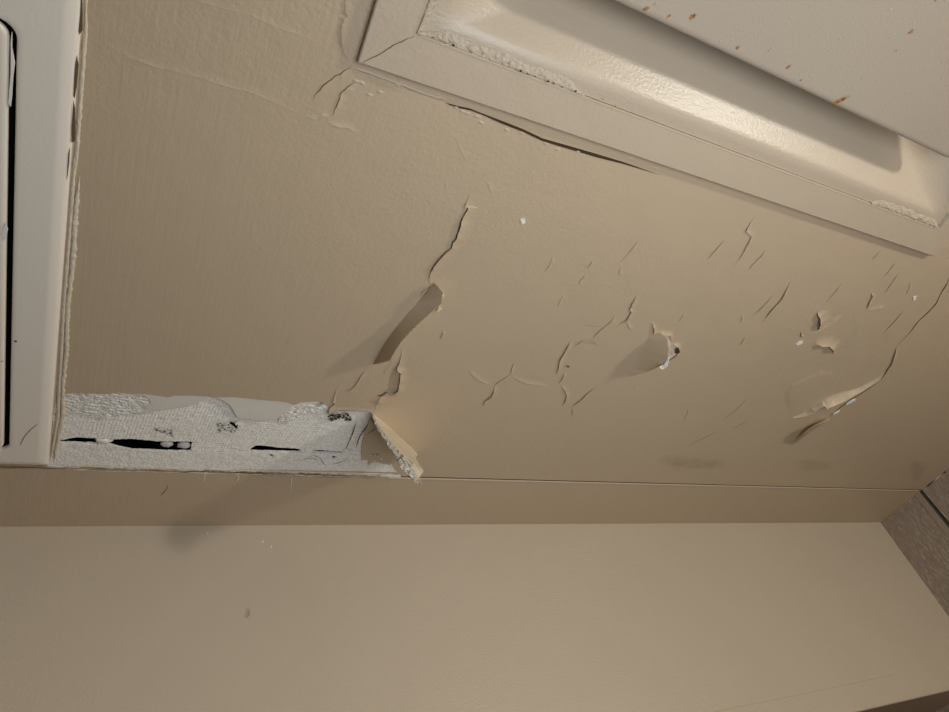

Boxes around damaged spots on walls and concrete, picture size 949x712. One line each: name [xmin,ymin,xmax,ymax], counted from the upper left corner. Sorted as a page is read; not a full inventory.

peeling [373,283,444,365]
peeling [629,320,683,376]
spalling [48,393,401,477]